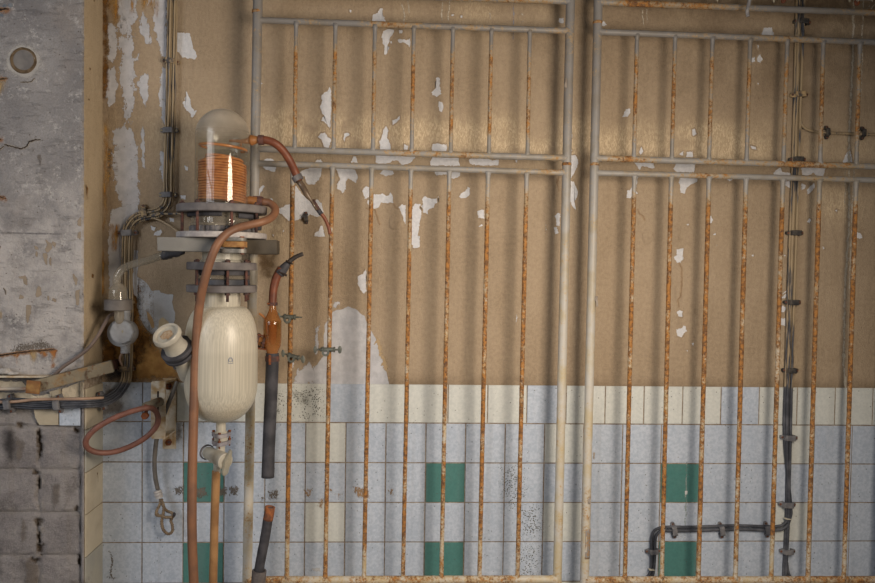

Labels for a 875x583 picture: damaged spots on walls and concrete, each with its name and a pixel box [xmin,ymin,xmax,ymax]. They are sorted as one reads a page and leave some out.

peeling [371,7,412,56]
crack [0,76,35,84]
peeling [430,76,445,113]
crack [0,138,41,150]
peeling [106,0,198,334]
peeling [259,86,441,249]
peeling [429,142,500,200]
peeling [570,132,580,211]
crack [0,232,62,247]
peeling [476,208,485,228]
crack [0,348,55,357]
peeling [292,302,390,384]